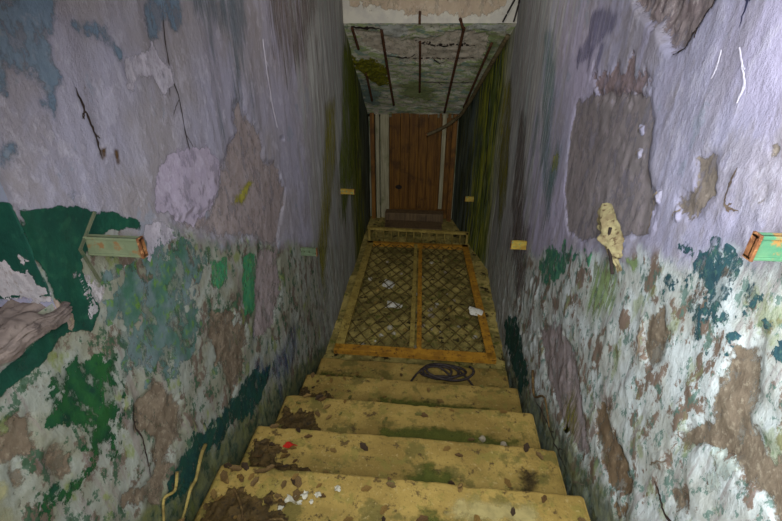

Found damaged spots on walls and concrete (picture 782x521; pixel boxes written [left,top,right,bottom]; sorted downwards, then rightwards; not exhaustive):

crack [75,87,103,160]
crack [163,17,193,150]
spalling [350,0,509,113]
flaking render [539,51,656,286]
flaking render [636,0,714,52]
flaking render [679,153,718,220]
peeling [0,102,284,521]
peeling [645,236,764,365]
flaking render [681,331,782,521]
crack [654,481,671,521]
flaking render [672,487,688,513]